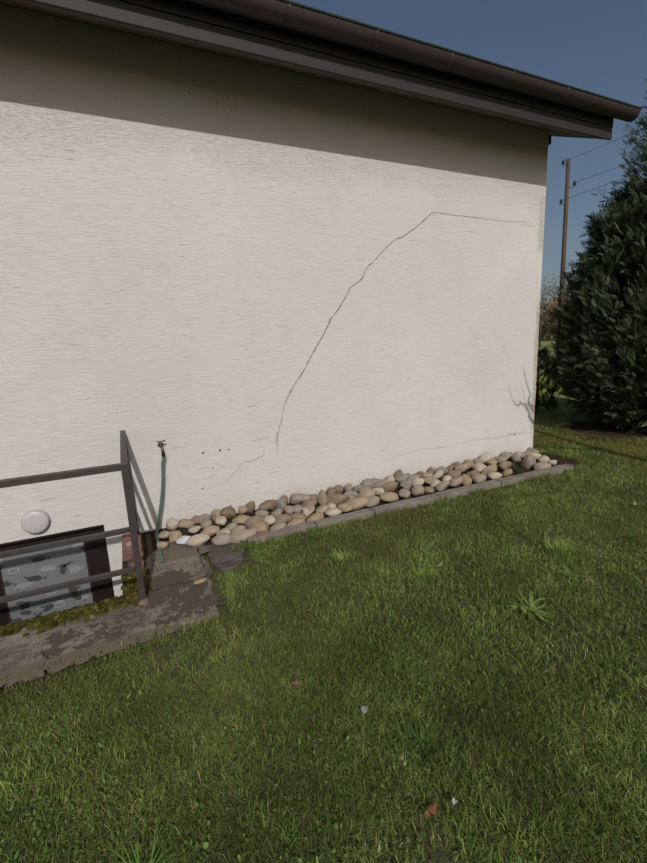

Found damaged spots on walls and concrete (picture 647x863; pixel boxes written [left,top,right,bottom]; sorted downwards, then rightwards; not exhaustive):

crack [209,212,531,488]